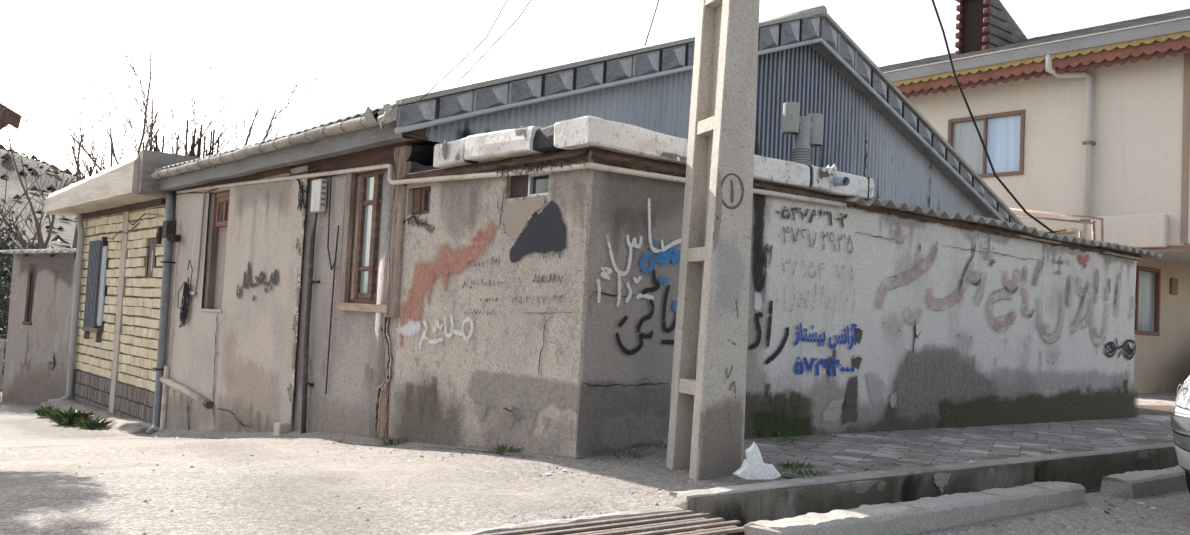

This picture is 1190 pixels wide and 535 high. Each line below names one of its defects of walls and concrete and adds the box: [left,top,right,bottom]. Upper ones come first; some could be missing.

crack [520,290,635,382]
damp [406,378,436,413]
damp [468,371,671,455]
damp [765,385,800,414]
damp [823,347,1129,424]